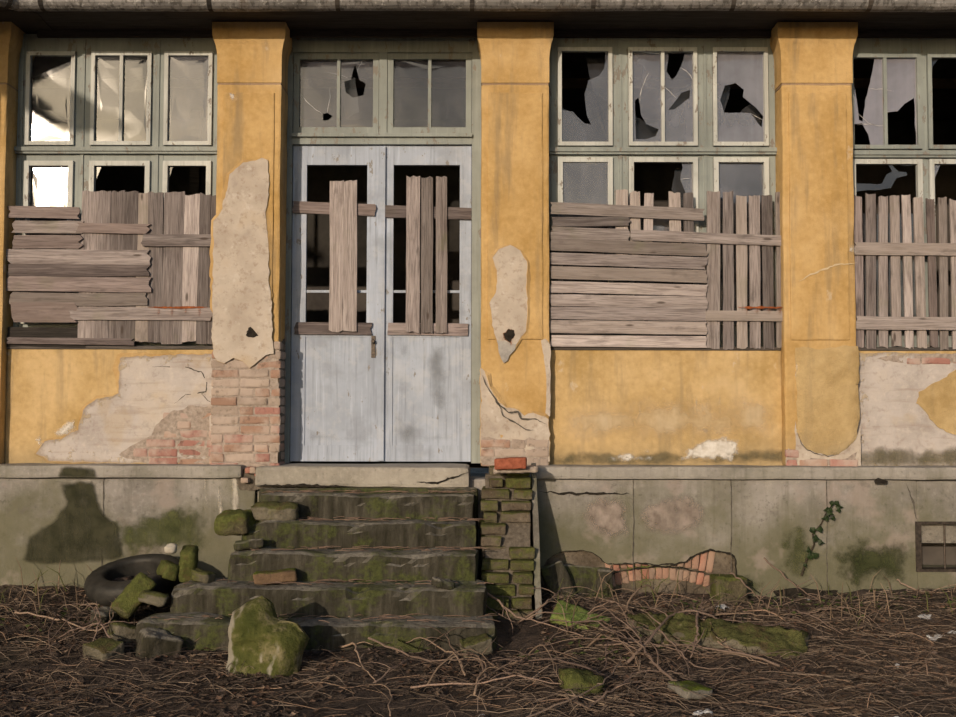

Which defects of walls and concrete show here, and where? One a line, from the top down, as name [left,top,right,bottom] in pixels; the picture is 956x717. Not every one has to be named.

peeling [34,158,286,491]
peeling [489,244,531,349]
crack [800,263,854,281]
peeling [479,339,551,474]
peeling [785,352,956,466]
crack [540,489,629,497]
flaking render [541,549,737,594]